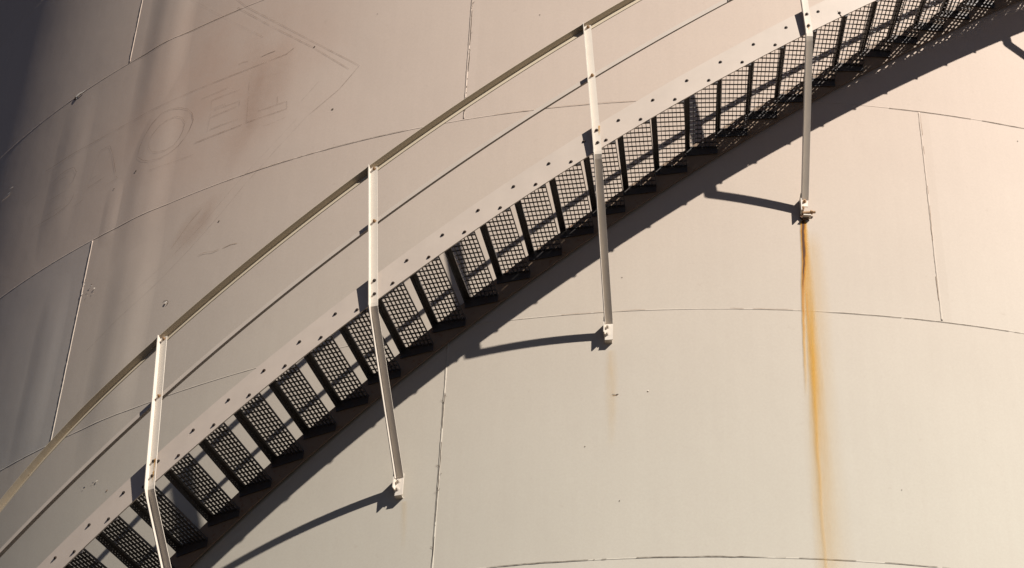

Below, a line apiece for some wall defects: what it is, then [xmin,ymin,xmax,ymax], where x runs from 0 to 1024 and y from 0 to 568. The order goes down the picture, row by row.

corrosion [801,221,811,353]